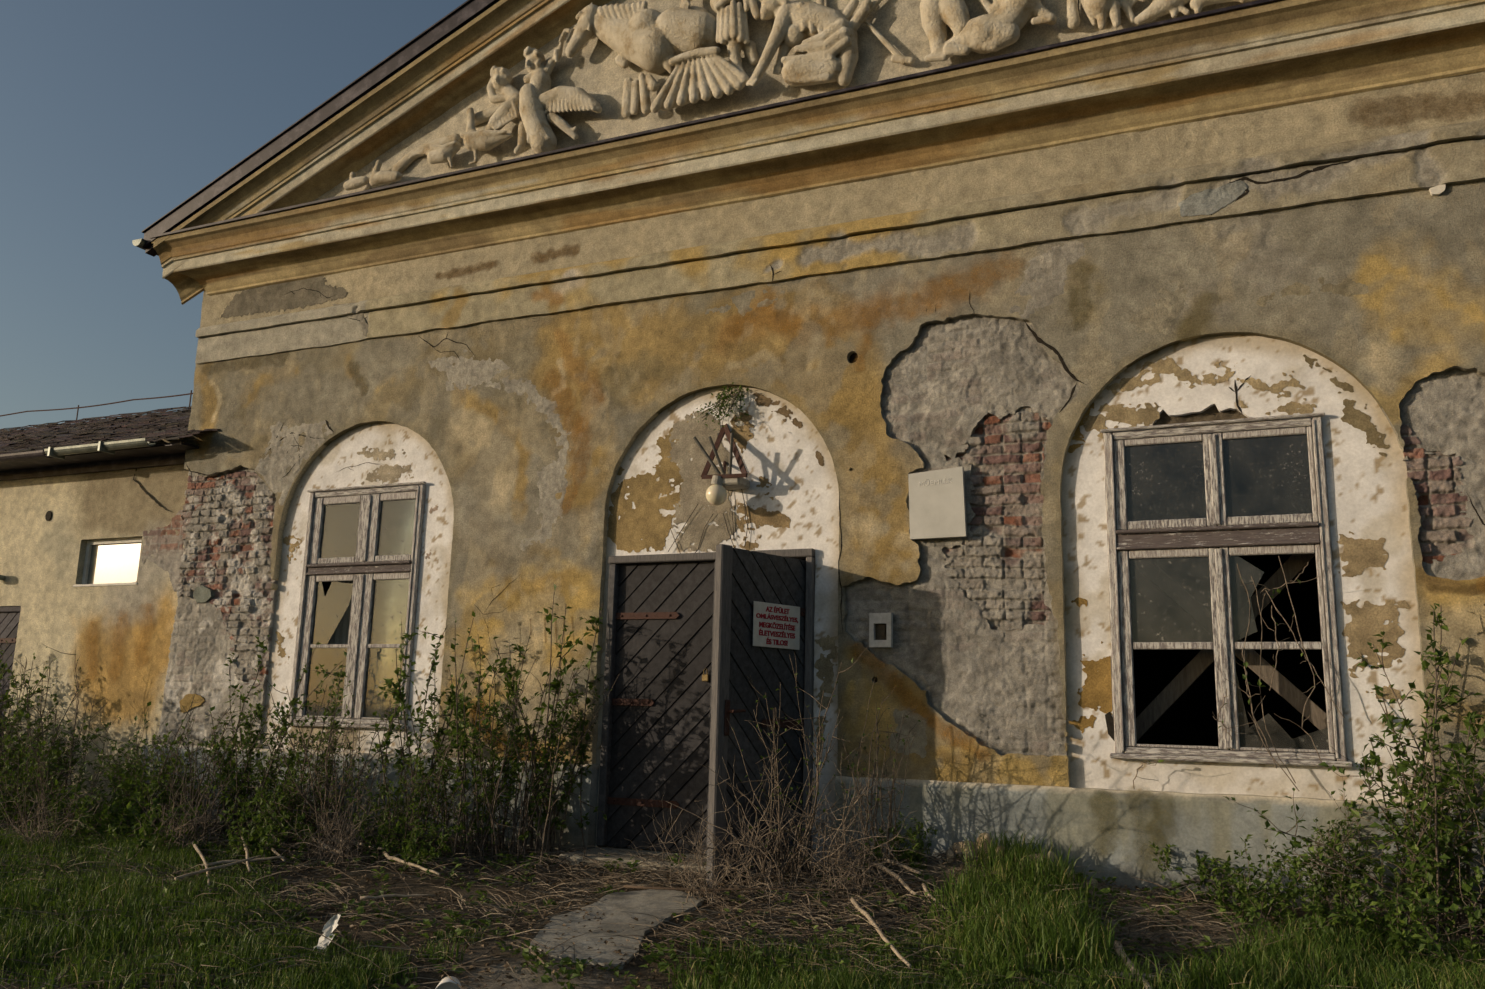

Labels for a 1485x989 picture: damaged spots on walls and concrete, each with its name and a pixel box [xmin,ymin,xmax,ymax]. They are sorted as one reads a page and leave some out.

spalling [1429,184,1446,196]
peeling [357,446,414,485]
peeling [607,392,803,553]
spalling [814,240,1485,757]
spalling [140,420,333,743]